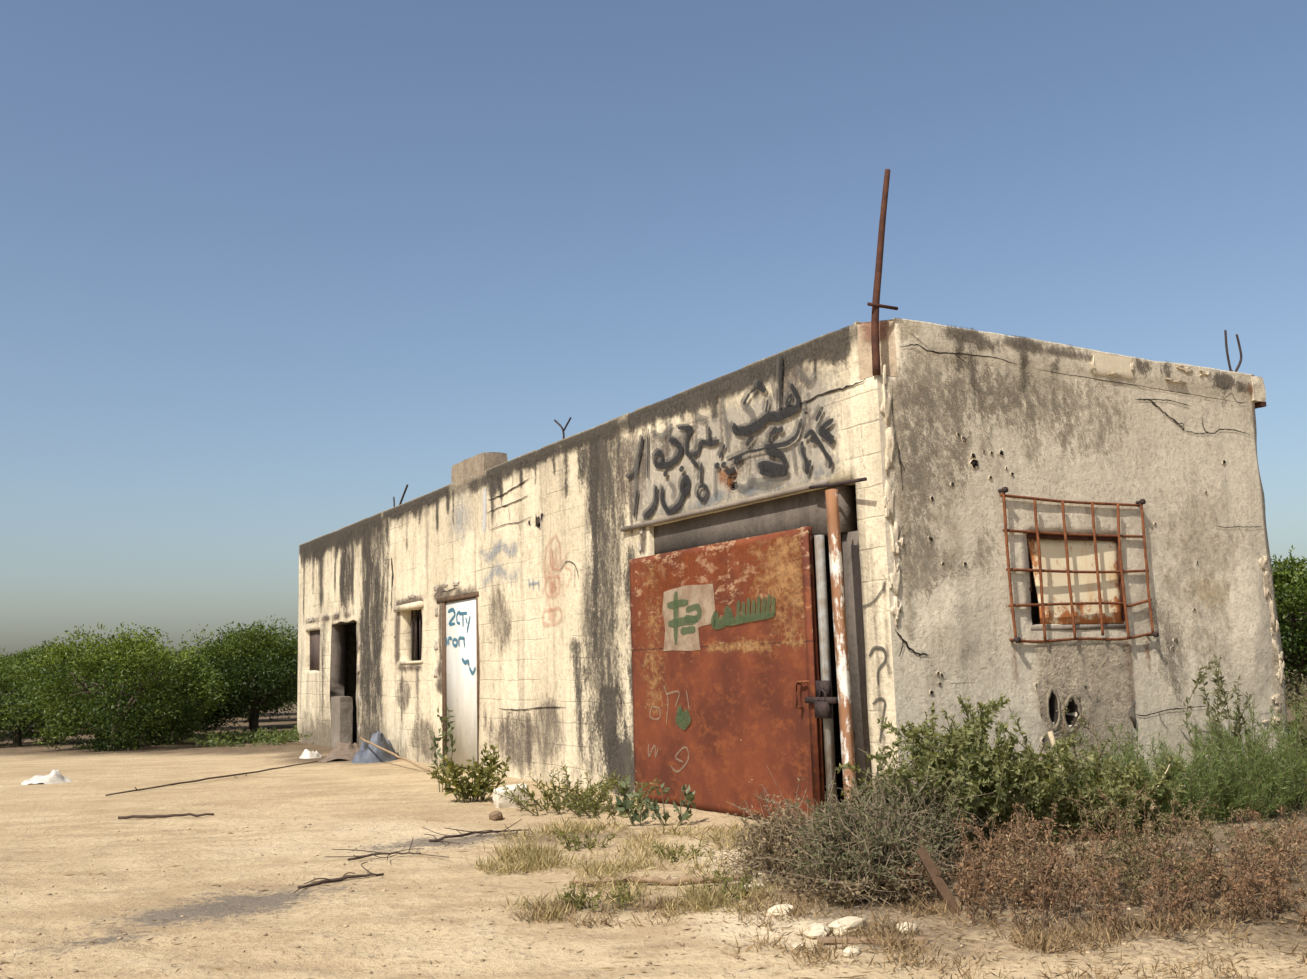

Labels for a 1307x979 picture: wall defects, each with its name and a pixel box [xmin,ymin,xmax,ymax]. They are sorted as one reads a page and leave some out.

crack [902,334,1249,435]
water stain [1136,358,1171,378]
peeling [1165,365,1211,384]
water stain [1212,372,1251,404]
crack [487,478,532,529]
water stain [889,325,1131,603]
water stain [469,326,850,797]
water stain [300,485,454,758]
rust [640,533,806,713]
crack [895,629,928,657]
spalling [1033,637,1136,782]